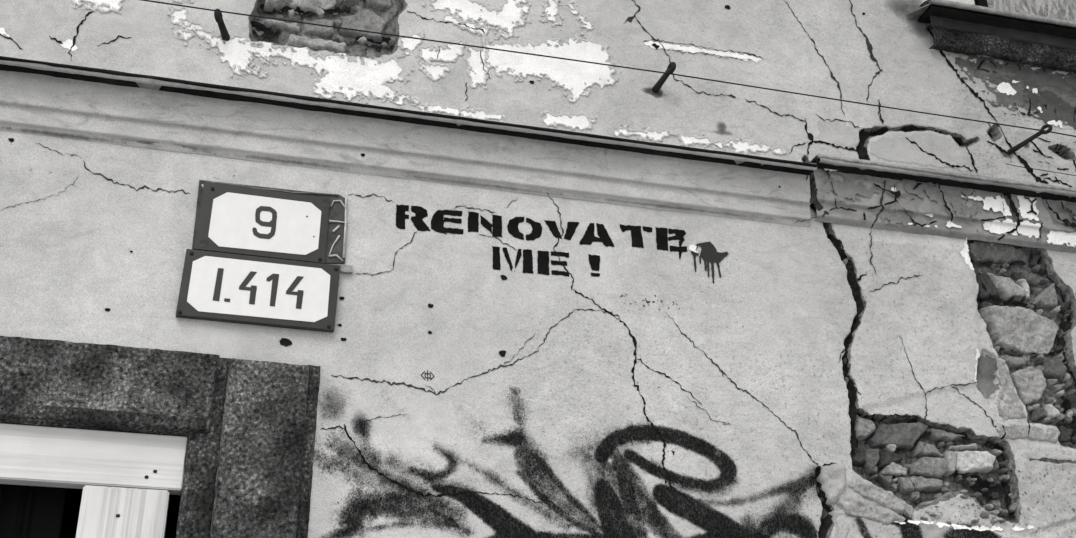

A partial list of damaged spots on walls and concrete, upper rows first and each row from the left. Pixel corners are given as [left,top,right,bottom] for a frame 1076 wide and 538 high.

crack [49,11,132,57]
peeling [167,0,622,134]
peeling [644,40,761,62]
flaking render [947,53,1076,130]
peeling [614,123,787,156]
flaking render [816,119,973,172]
crack [623,0,1076,538]
flaking render [820,169,1076,538]